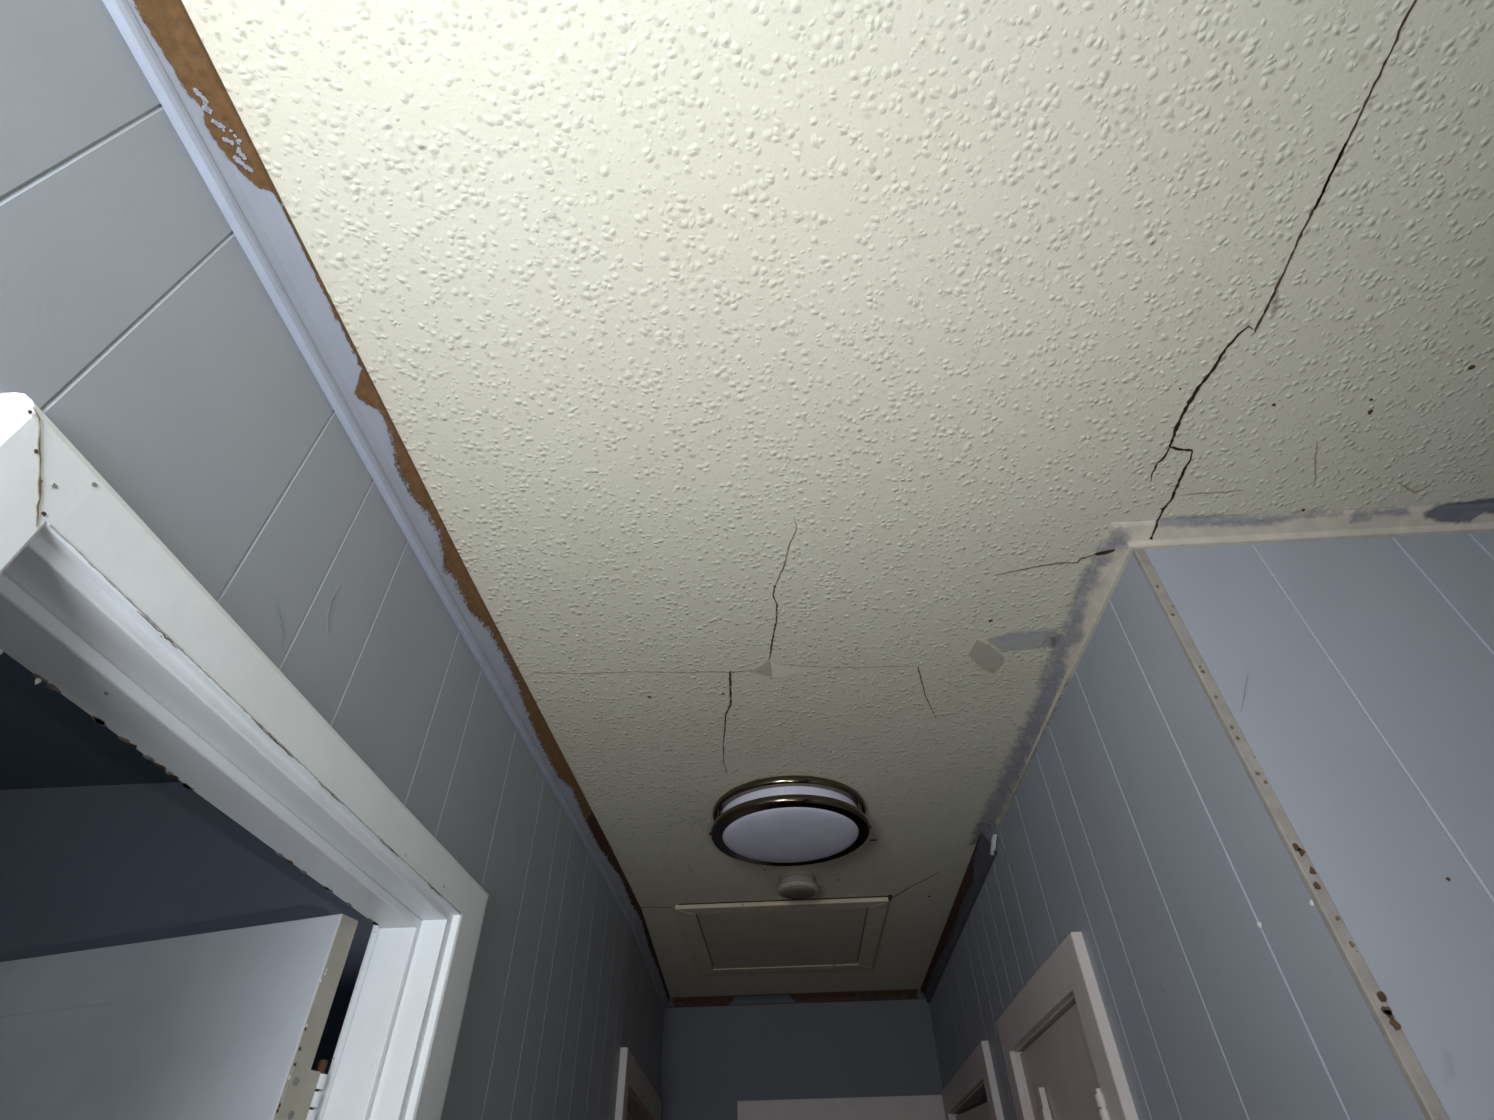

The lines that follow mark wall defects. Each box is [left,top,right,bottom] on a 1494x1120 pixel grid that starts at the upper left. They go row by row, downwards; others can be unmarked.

peeling [91,716,195,790]
crack [28,407,461,913]
peeling [133,0,997,1007]
crack [533,518,936,773]
crack [997,549,1115,575]
crack [1149,0,1417,540]